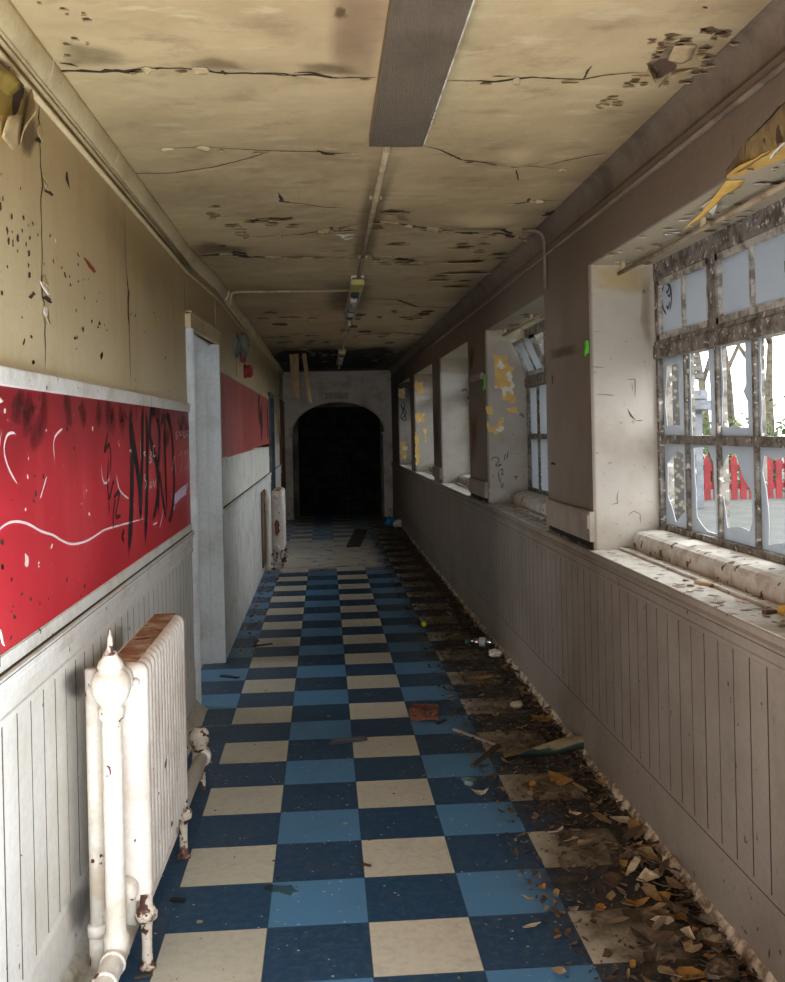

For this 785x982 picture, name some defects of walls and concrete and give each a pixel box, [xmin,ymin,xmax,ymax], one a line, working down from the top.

peeling [0,68,44,150]
crack [61,63,376,81]
crack [466,66,650,85]
flaking render [595,26,740,110]
crack [12,87,53,363]
peeling [0,197,84,325]
crack [123,246,131,337]
crack [136,146,343,174]
crack [198,146,607,265]
peeling [662,104,785,236]
peeling [485,355,525,435]